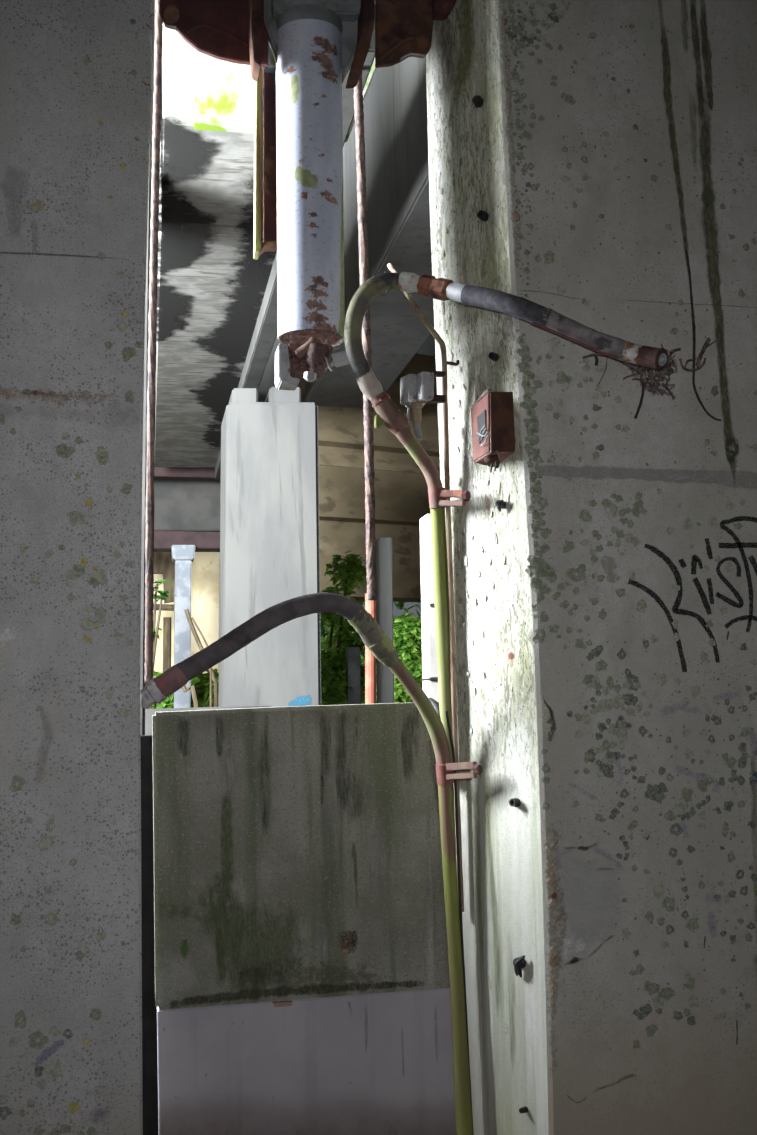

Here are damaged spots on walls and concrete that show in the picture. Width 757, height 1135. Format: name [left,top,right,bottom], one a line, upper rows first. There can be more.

damp [538,0,757,488]